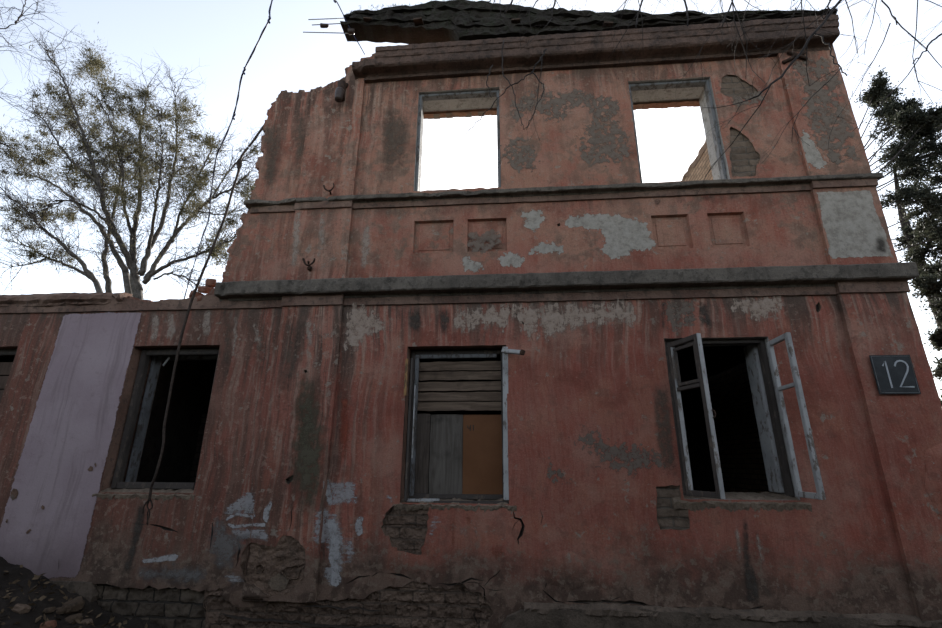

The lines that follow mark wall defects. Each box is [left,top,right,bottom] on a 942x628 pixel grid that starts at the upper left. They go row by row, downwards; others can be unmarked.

peeling [500,88,633,173]
peeling [557,213,656,260]
peeling [816,190,891,259]
peeling [454,298,636,341]
crack [513,510,543,544]
crack [346,573,411,584]
flaking render [97,581,494,628]